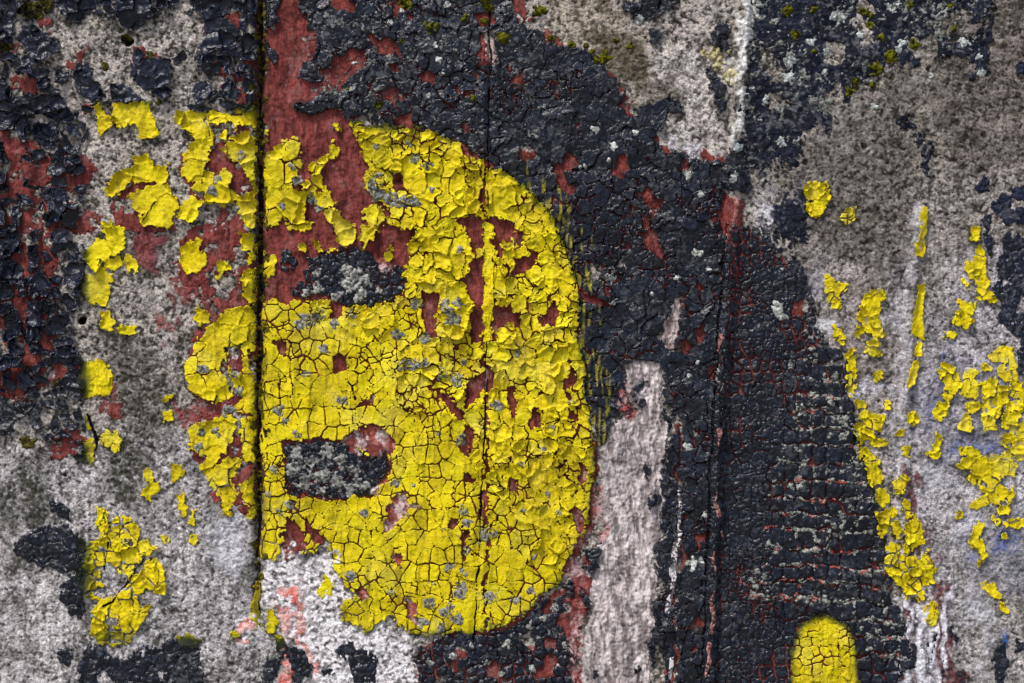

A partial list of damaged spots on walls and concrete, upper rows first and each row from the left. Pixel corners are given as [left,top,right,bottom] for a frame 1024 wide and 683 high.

peeling [13,497,204,683]
spalling [0,0,262,527]
crack [254,0,271,628]
crack [472,342,488,666]
crack [485,11,493,171]
crack [577,286,610,306]
peeling [230,0,997,683]
crack [699,225,727,683]
peeling [925,176,1024,567]
peeling [980,580,1010,614]